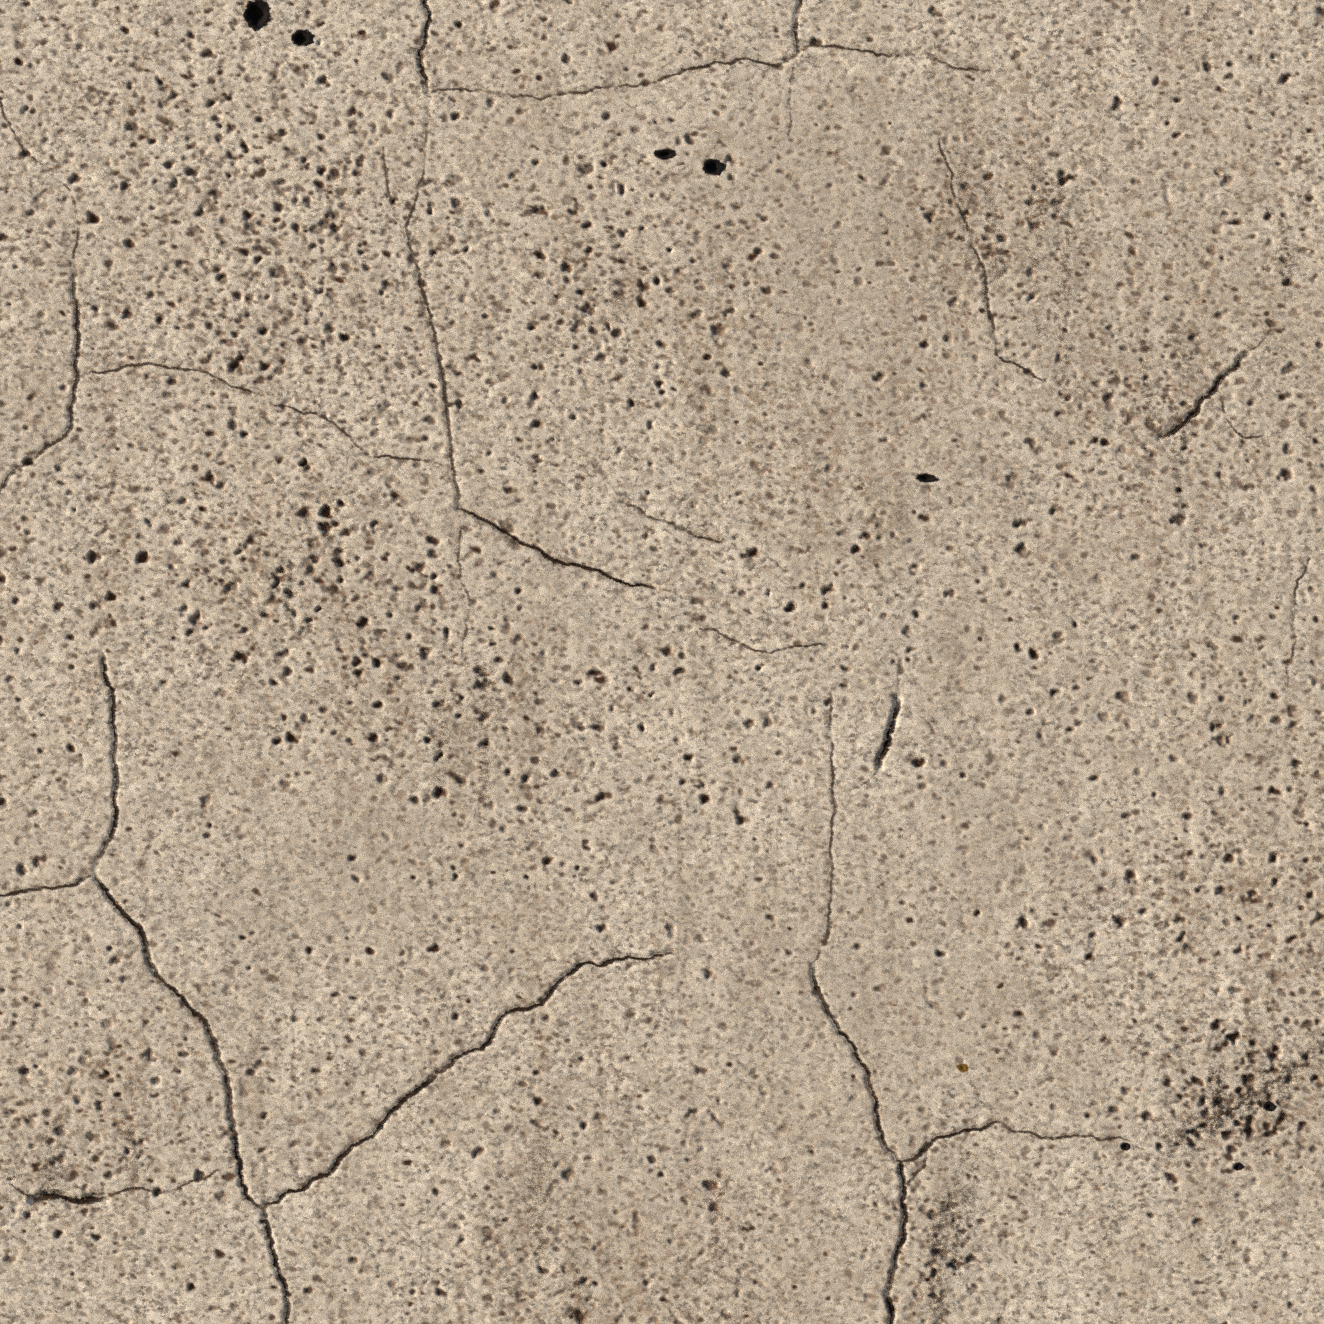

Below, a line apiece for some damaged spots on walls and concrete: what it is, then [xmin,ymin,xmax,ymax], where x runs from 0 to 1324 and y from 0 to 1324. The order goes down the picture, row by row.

crack [418,0,990,135]
crack [937,140,1046,382]
crack [0,101,665,656]
crack [1160,331,1270,439]
crack [626,504,721,543]
crack [699,628,823,654]
crack [1285,557,1309,679]
crack [0,652,672,1324]
crack [812,664,1130,1324]
crack [1212,1072,1292,1124]